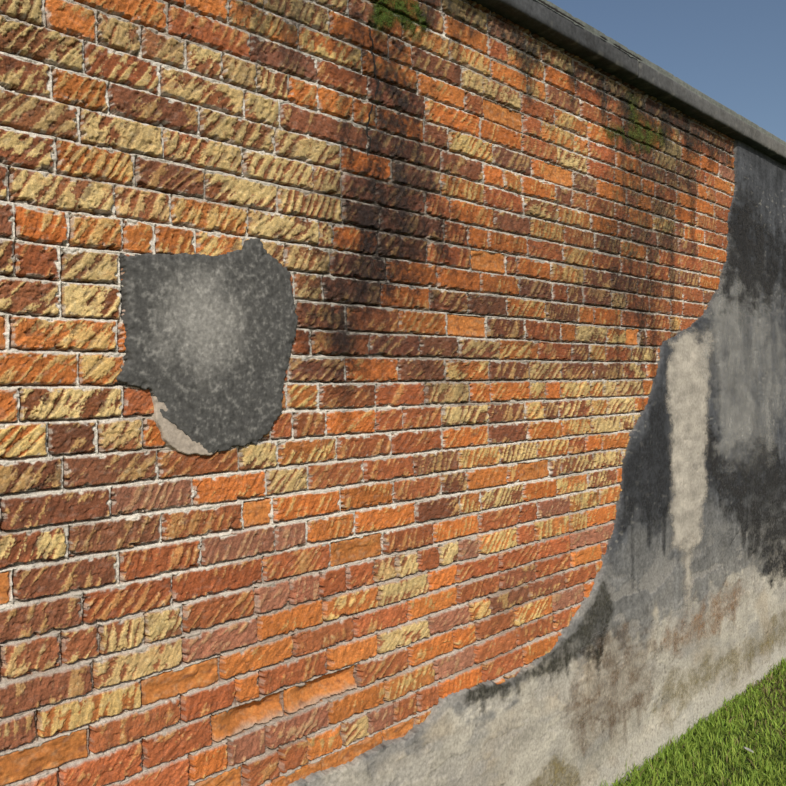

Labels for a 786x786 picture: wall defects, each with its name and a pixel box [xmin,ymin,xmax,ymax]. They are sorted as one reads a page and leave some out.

leakage [565,63,732,287]
leakage [722,188,786,309]
peeling [150,394,218,456]
spalling [242,498,271,527]
peeling [272,140,786,786]
leakage [621,332,786,623]
spalling [140,658,219,705]
spalling [210,665,357,742]
spalling [194,766,241,786]